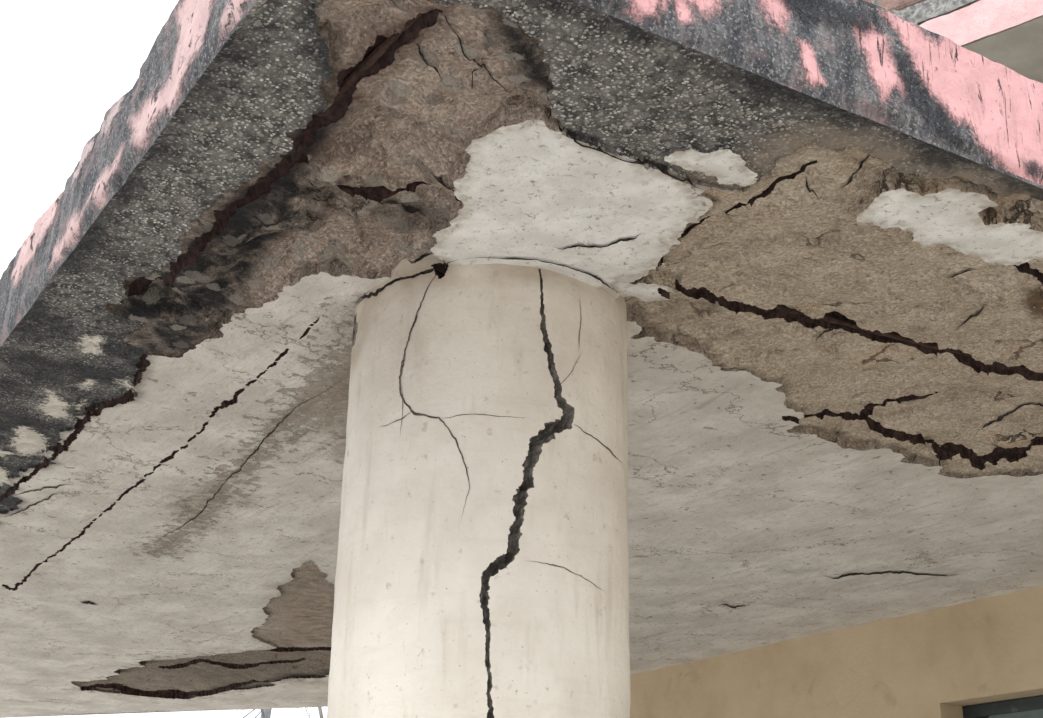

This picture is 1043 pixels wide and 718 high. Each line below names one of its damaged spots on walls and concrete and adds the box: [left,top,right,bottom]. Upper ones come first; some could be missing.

peeling [48,0,247,269]
spalling [104,0,567,358]
spalling [616,10,1043,479]
crack [0,318,340,591]
spalling [71,561,335,699]
crack [356,235,638,718]
crack [827,571,971,579]